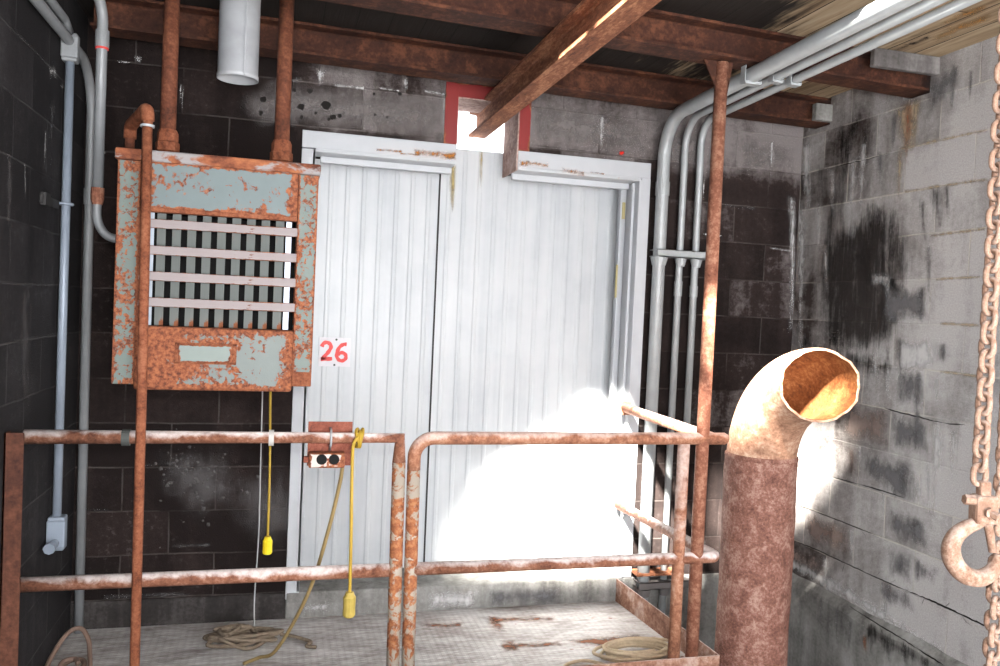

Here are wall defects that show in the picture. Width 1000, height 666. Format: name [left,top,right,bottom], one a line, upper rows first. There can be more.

rust [415,150,456,191]
leakage [817,123,867,240]
leakage [865,207,923,321]
rust [491,617,553,629]
rust [502,642,555,650]
rust [578,636,639,645]